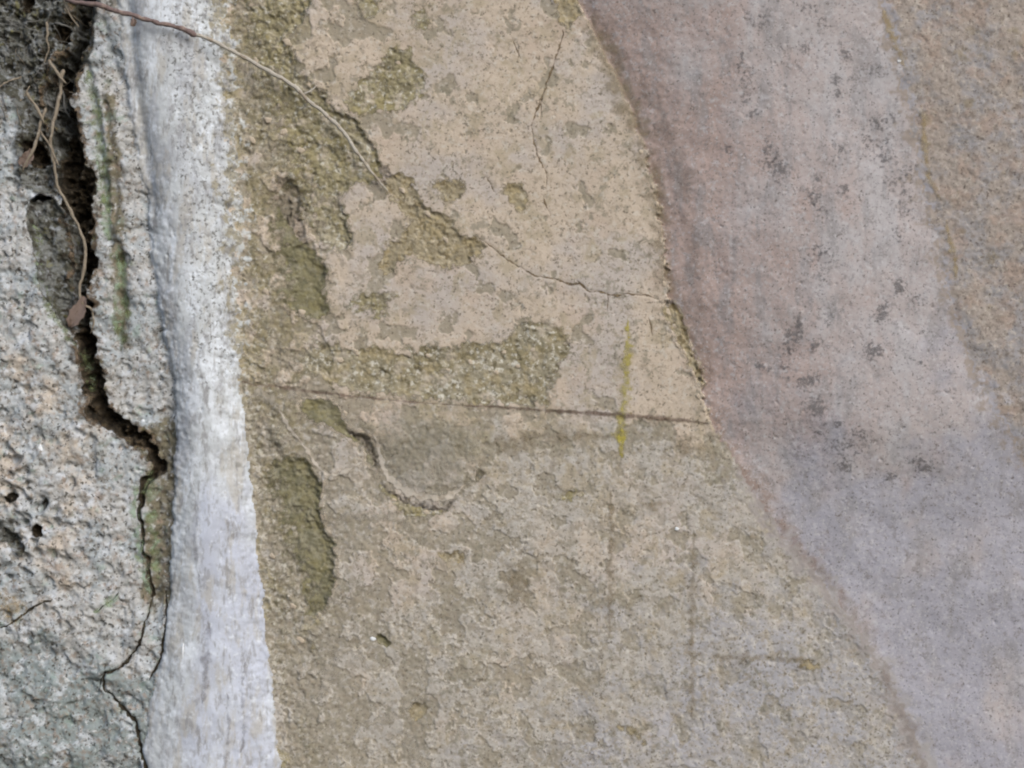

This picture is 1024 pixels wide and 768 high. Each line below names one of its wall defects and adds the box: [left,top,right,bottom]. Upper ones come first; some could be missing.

crack [0,0,168,768]
damp [91,93,112,240]
damp [112,251,132,350]
spalling [231,0,487,323]
spalling [245,317,573,517]
spalling [503,182,528,213]
crack [531,30,564,215]
crack [478,238,656,332]